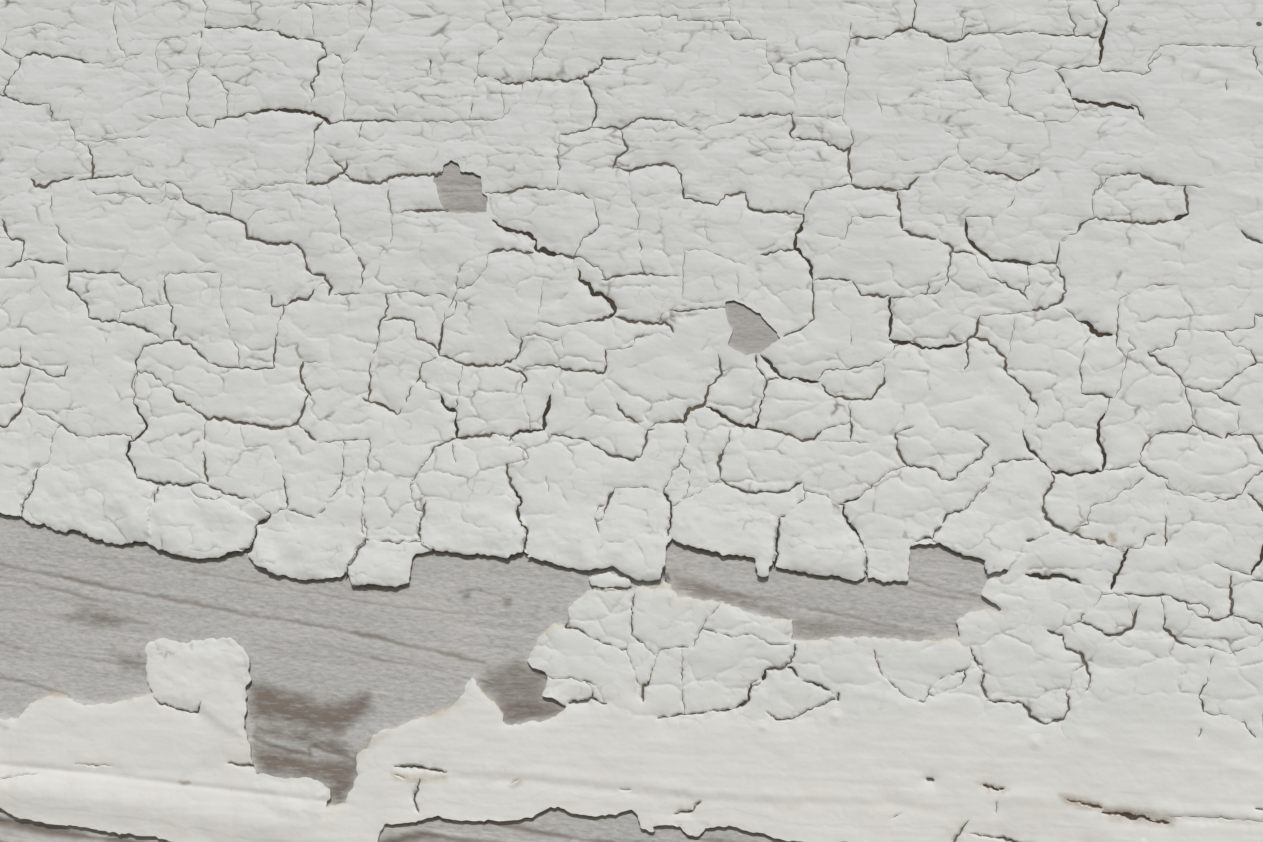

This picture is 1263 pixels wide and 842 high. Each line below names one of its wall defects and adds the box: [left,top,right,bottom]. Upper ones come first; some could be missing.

peeling [434,161,488,214]
crack [0,22,371,517]
crack [147,0,1263,704]
peeling [726,301,780,355]
peeling [0,465,1021,825]
crack [565,594,839,721]
crack [154,698,201,713]
crack [874,647,1072,725]
crack [1199,677,1227,715]
peeling [0,808,171,842]
peeling [379,807,802,842]